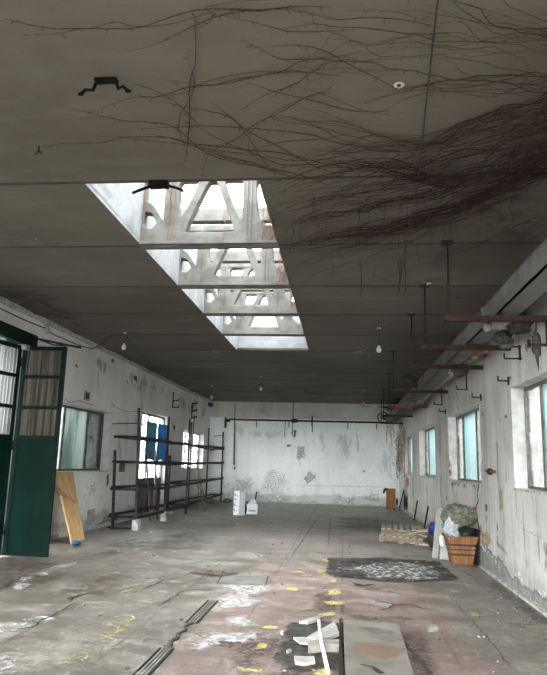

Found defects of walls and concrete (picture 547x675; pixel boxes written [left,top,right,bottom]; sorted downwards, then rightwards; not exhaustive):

crack [0,593,89,629]